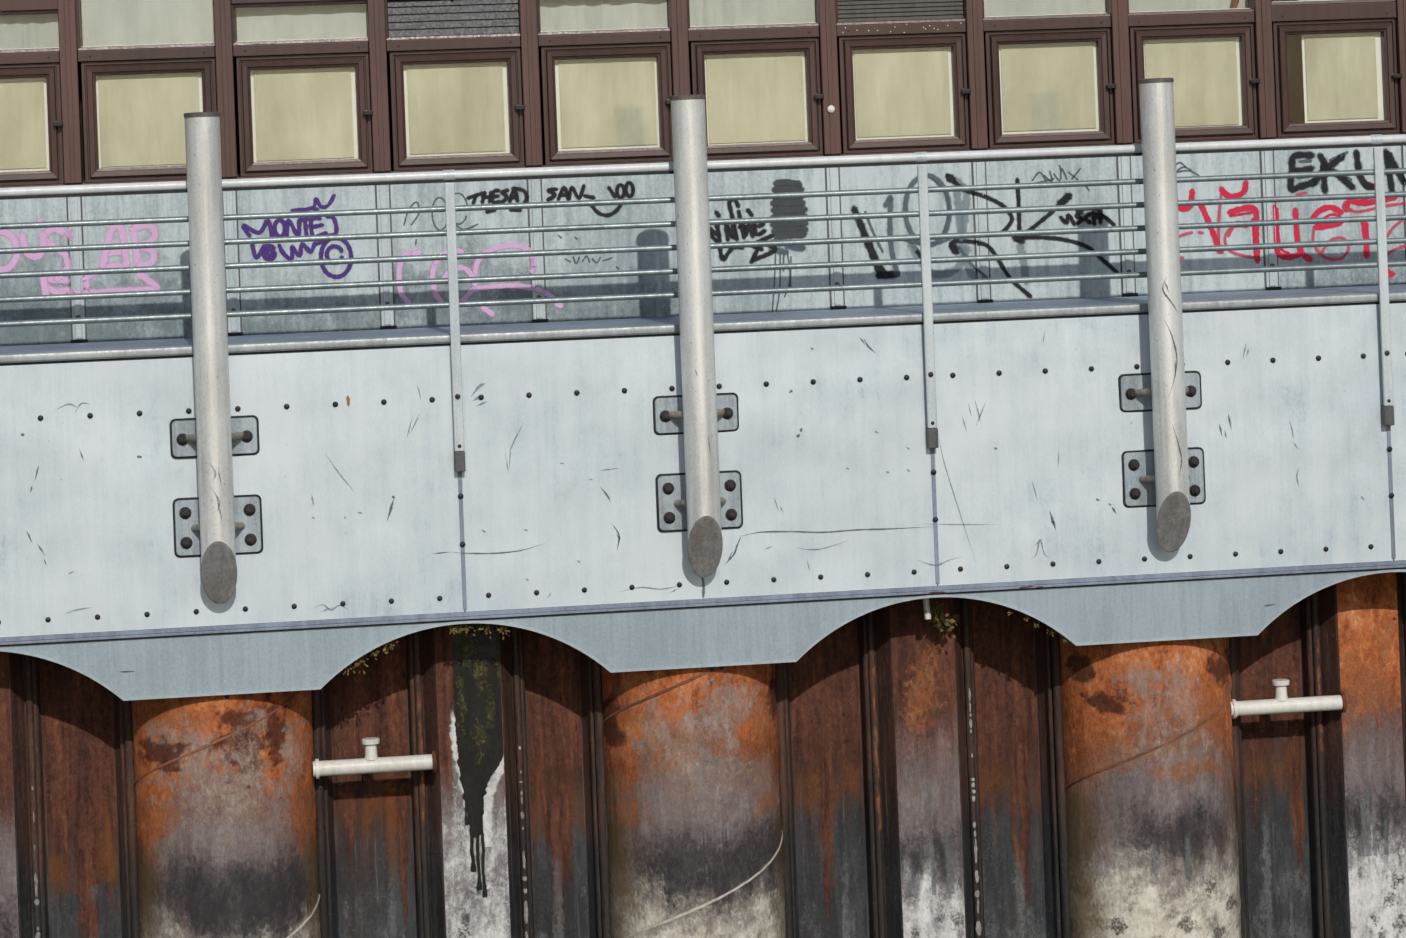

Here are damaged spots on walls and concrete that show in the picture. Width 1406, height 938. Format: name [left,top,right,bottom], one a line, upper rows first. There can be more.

rust [41,658,117,938]
rust [132,690,317,867]
damp [136,844,321,938]
rust [330,625,457,916]
damp [442,761,564,938]
damp [607,816,786,938]
rust [601,619,879,911]
rust [891,591,957,738]
rust [1060,603,1304,867]
damp [1066,788,1308,938]
rust [1337,572,1402,740]
damp [1346,788,1406,938]